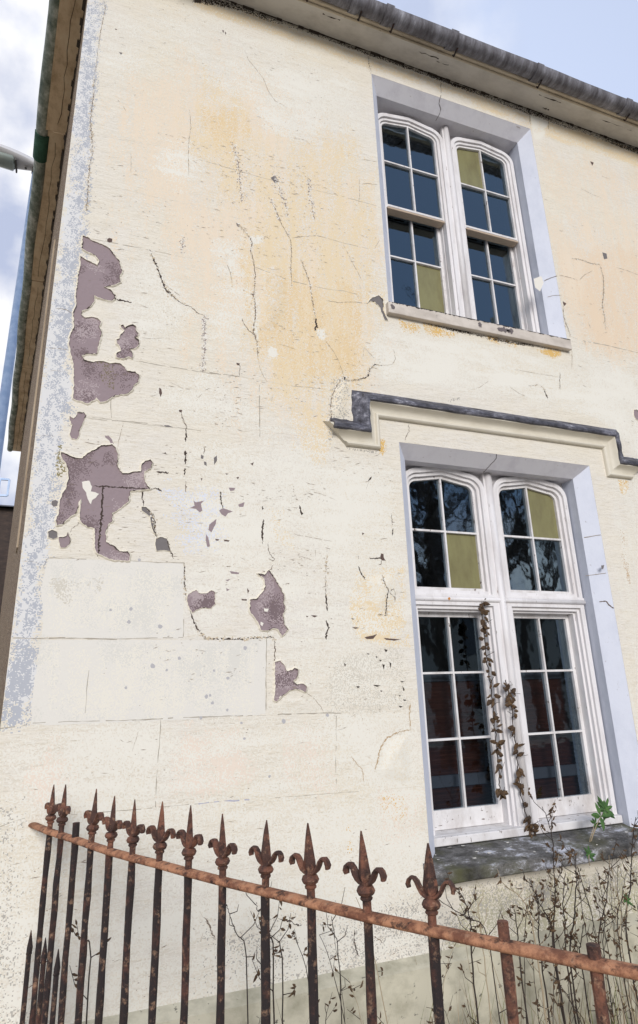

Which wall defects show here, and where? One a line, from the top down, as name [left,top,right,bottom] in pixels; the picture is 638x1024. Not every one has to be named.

peeling [0,0,453,1024]
crack [149,178,396,418]
water stain [98,0,638,480]